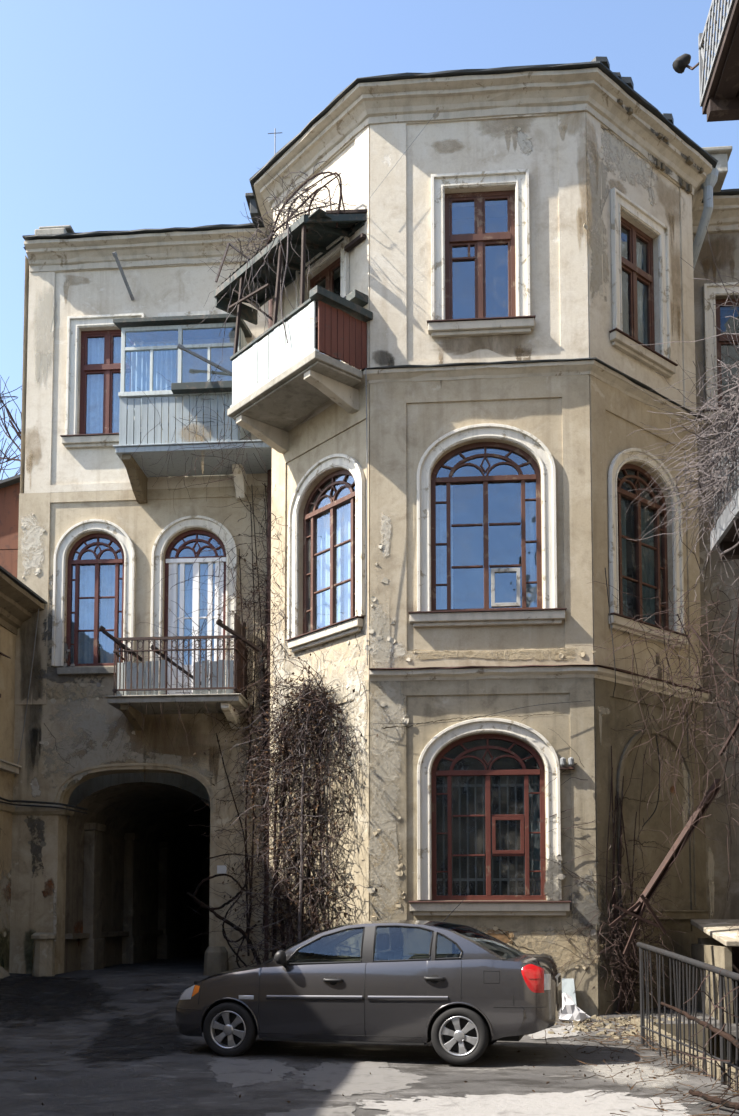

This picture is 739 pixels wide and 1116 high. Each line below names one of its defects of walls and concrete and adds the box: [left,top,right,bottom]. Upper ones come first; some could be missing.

flaking render [21,513,53,585]
leakage [21,629,219,788]
flaking render [344,604,595,767]
flaking render [24,815,46,878]